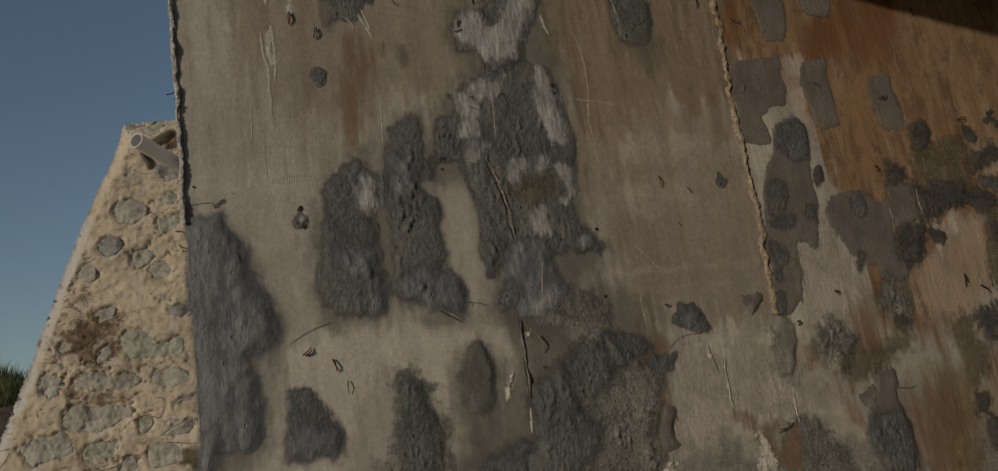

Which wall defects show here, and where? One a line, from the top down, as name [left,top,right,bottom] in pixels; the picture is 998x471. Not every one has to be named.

damp [769,241,789,317]
crack [792,344,813,424]